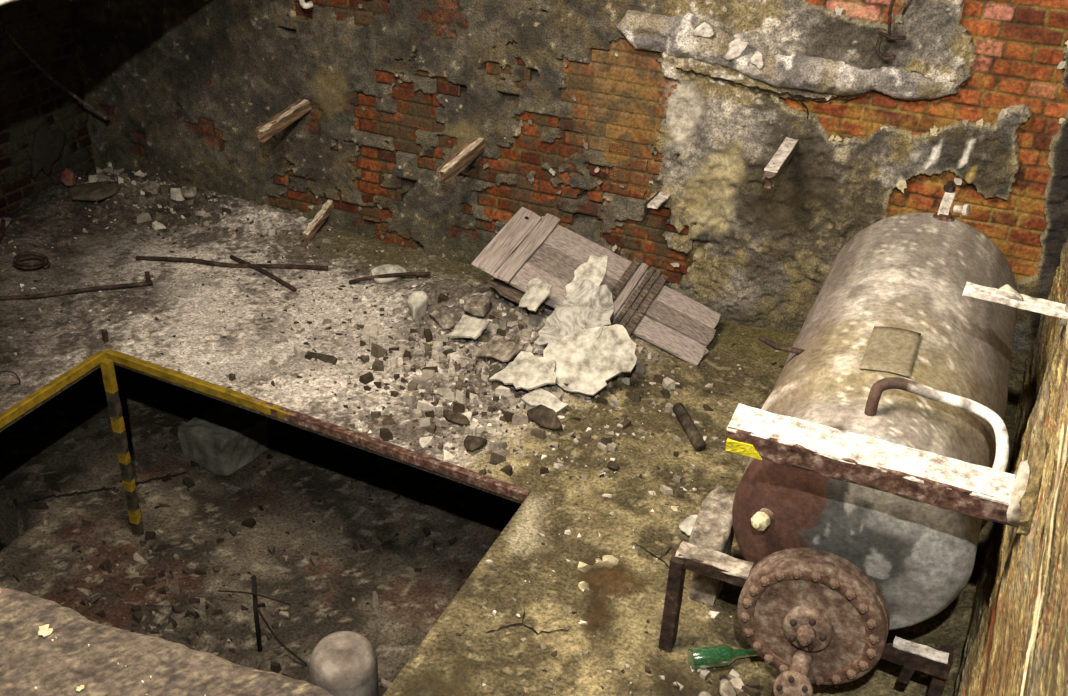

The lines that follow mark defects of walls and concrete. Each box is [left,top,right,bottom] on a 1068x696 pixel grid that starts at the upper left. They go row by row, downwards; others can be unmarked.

spalling [292,0,390,27]
spalling [268,70,460,249]
spalling [463,38,695,284]
spalling [770,0,1068,280]